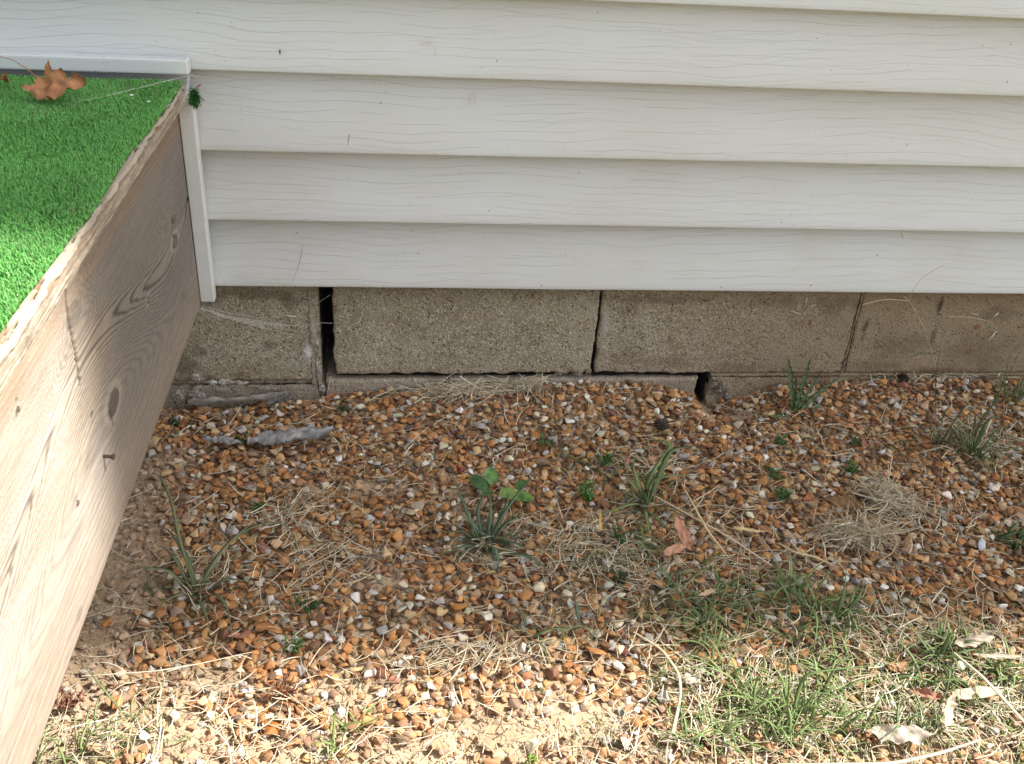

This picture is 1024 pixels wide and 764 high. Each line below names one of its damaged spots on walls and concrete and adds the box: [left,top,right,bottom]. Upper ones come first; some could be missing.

crack [714,302,1004,379]